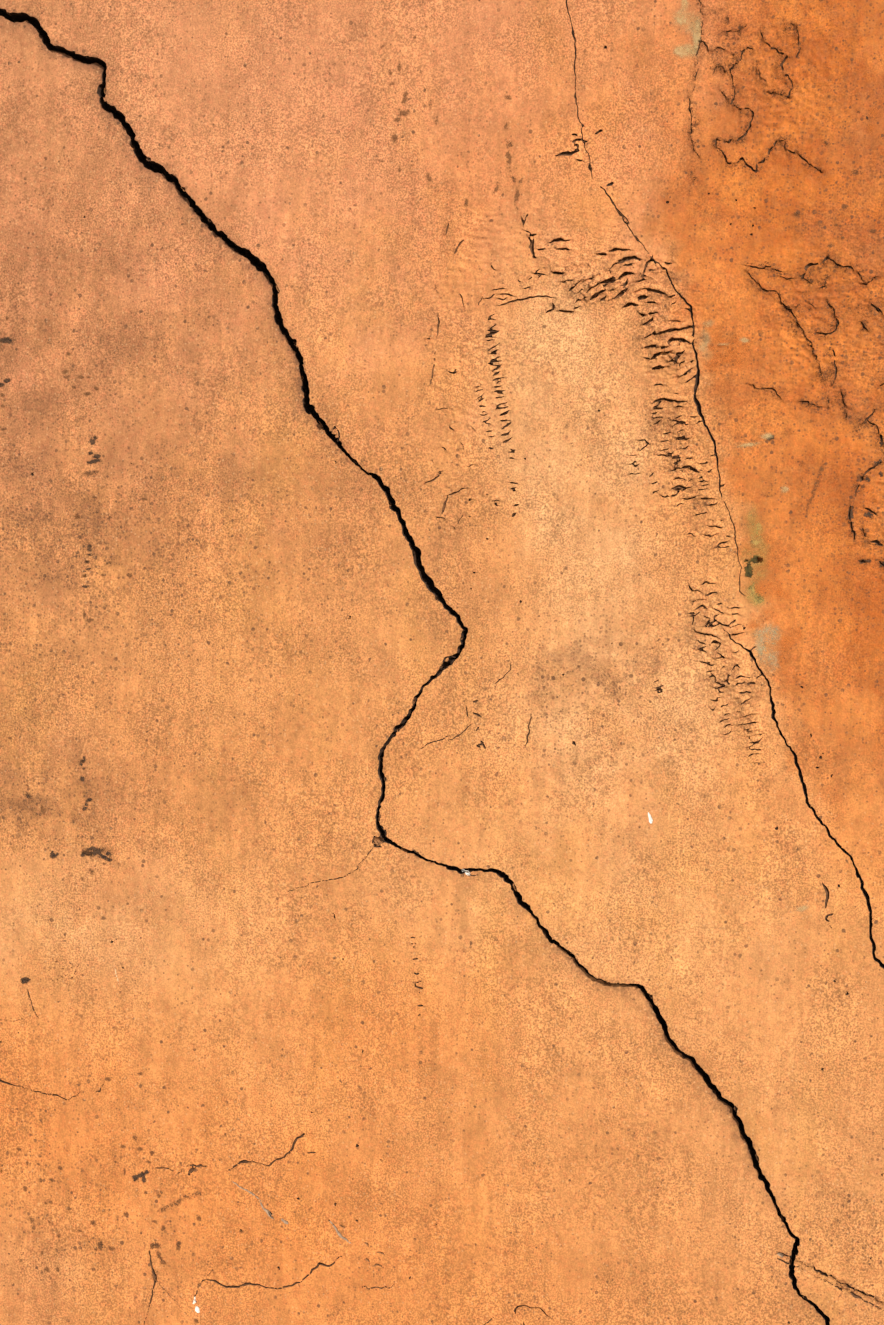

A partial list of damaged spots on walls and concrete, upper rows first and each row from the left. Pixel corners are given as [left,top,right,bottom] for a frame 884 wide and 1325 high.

crack [0,8,468,892]
crack [566,0,745,596]
crack [420,663,511,749]
crack [726,631,884,969]
crack [0,1080,105,1100]
crack [144,1220,394,1324]
crack [228,1133,316,1224]
crack [401,848,830,1325]